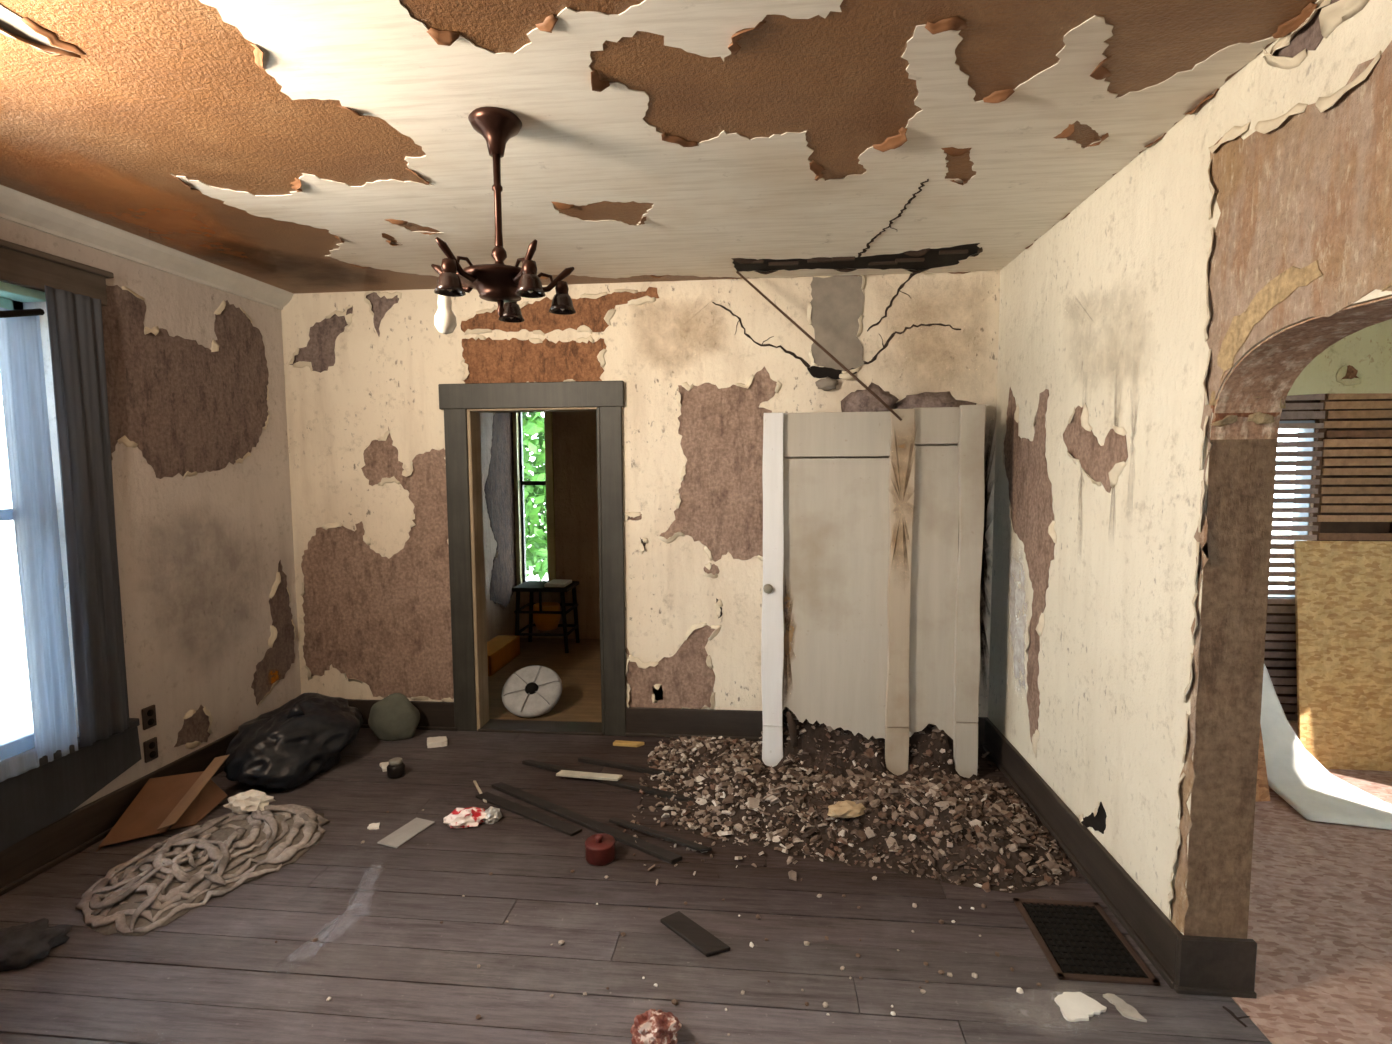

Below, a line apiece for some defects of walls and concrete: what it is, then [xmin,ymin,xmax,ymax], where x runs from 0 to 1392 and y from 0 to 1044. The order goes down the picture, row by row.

peeling [170,0,1369,386]
crack [858,179,929,257]
spalling [102,285,270,479]
crack [712,302,810,368]
spalling [807,351,861,391]
crack [864,273,961,364]
spalling [251,427,454,707]
spalling [624,512,642,522]
spalling [639,366,782,578]
spalling [1002,387,1057,757]
spalling [1063,403,1128,493]
spalling [625,598,723,709]